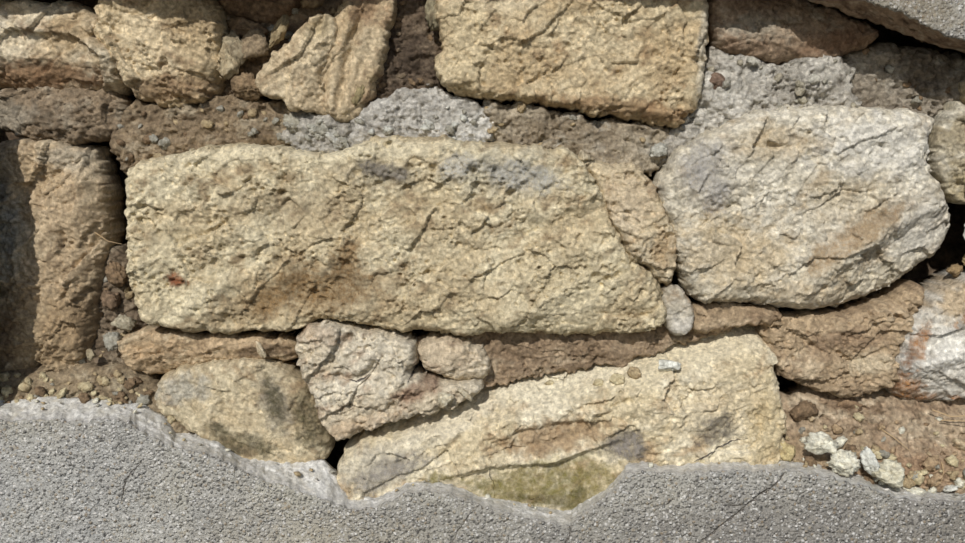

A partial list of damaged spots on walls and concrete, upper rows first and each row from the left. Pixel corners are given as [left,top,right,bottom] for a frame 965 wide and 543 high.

spalling [806,0,965,54]
spalling [0,396,965,526]
crack [700,474,784,543]